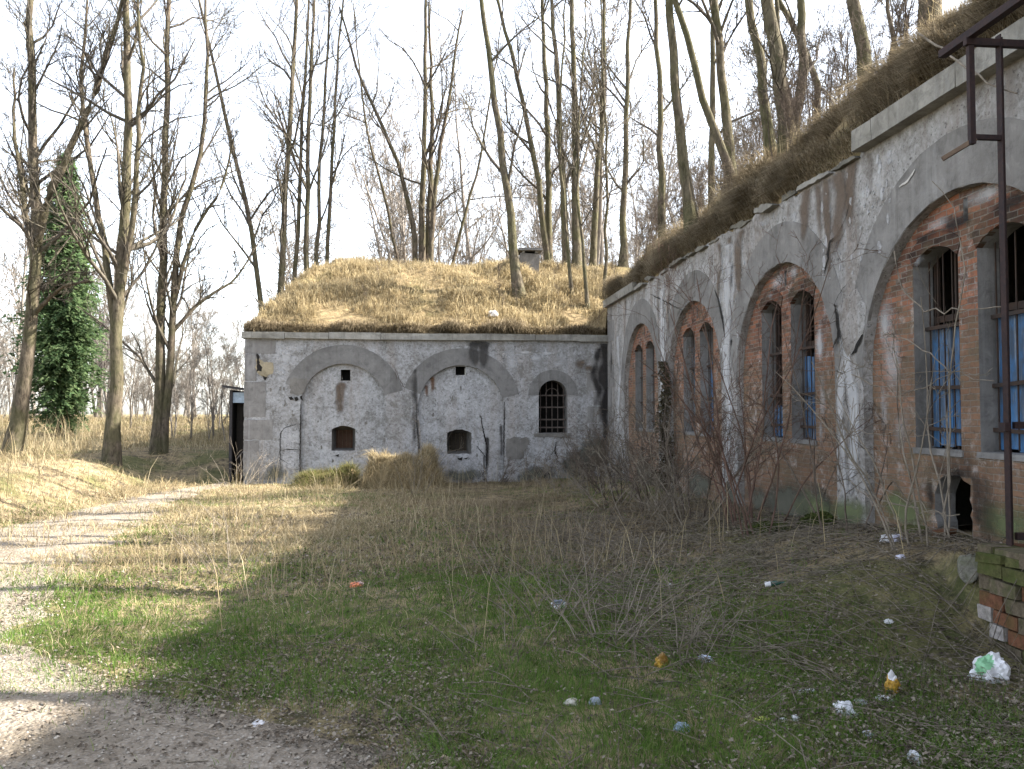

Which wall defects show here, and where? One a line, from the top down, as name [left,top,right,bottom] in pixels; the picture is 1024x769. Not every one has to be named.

water stain [800,162,856,264]
flaking render [255,353,310,470]
water stain [470,342,489,366]
water stain [591,337,621,446]
water stain [658,274,670,392]
crack [824,205,863,448]
water stain [838,338,859,477]